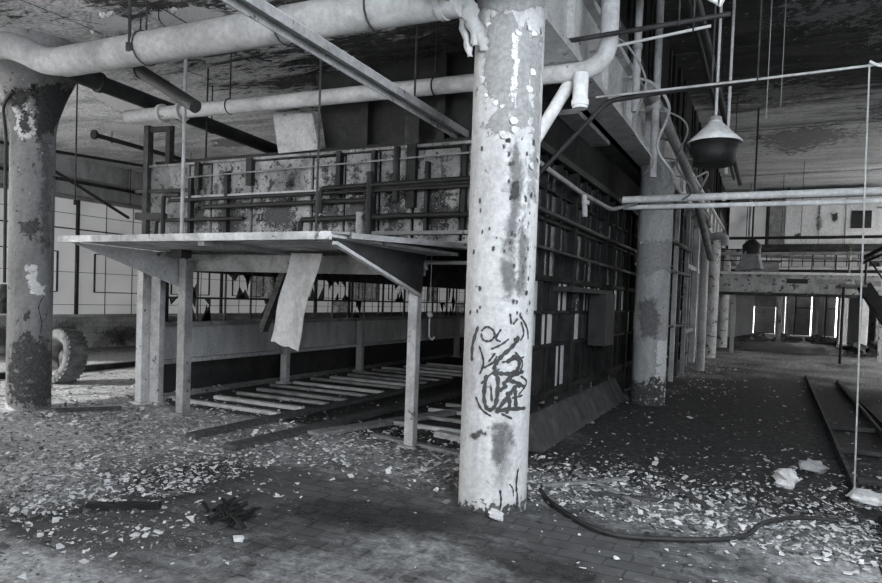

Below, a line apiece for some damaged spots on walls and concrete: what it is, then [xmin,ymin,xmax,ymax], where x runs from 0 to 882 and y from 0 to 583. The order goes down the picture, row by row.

peeling [81,3,230,37]
peeling [758,0,882,55]
peeling [727,68,857,109]
peeling [0,102,37,140]
peeling [476,0,545,315]
spalling [18,218,40,236]
peeling [25,264,46,295]